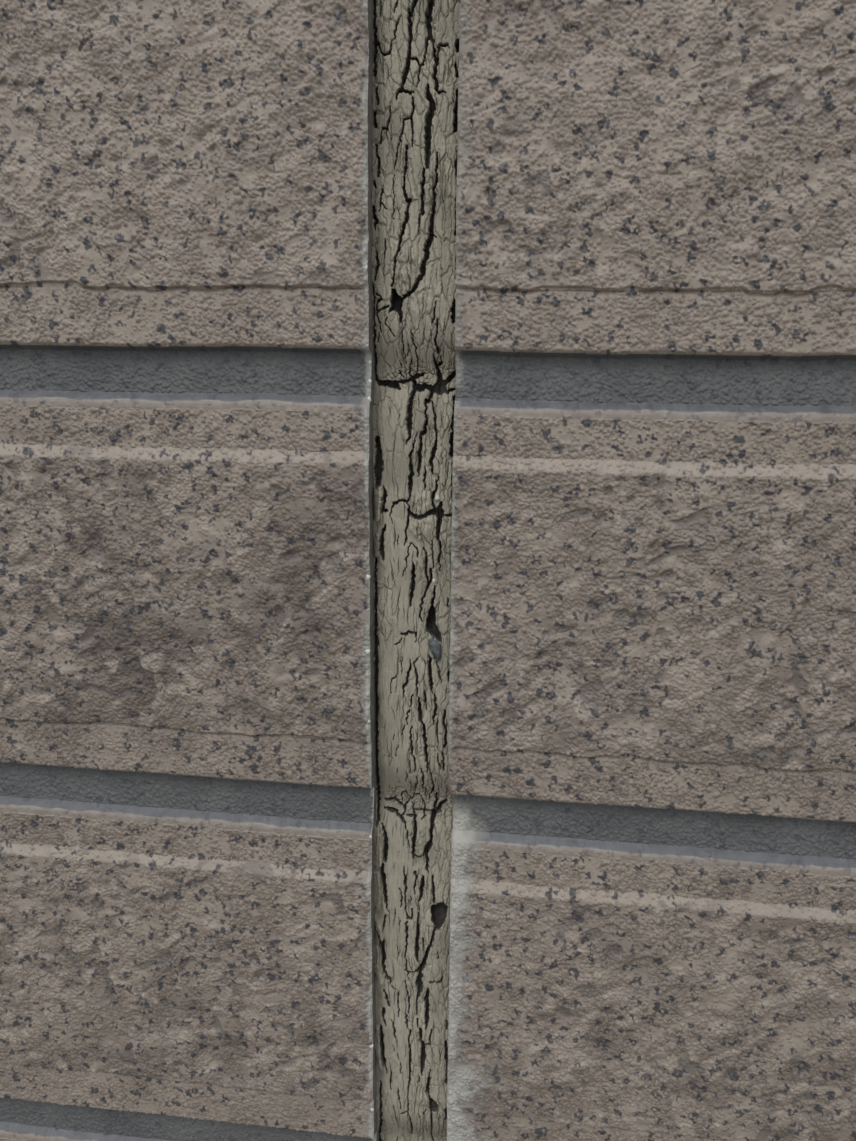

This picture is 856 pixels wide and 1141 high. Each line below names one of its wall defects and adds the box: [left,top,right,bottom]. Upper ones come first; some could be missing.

crack [376,0,456,1141]